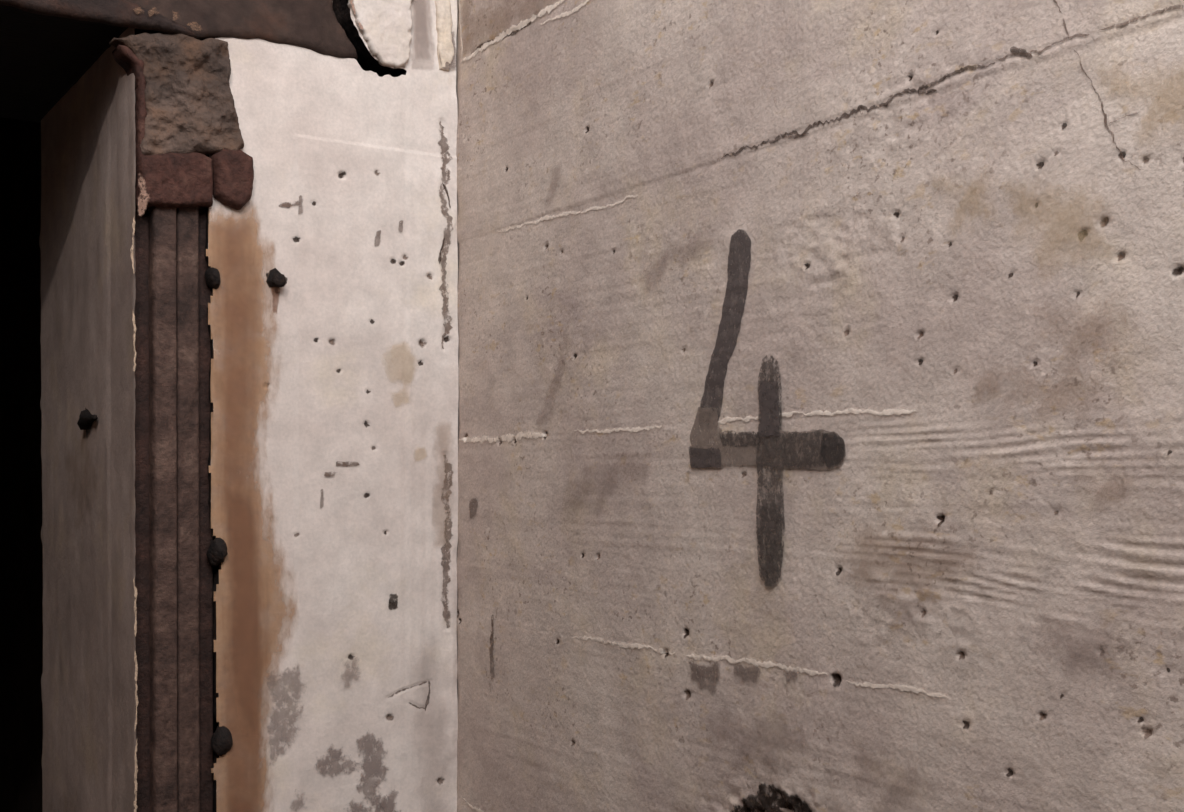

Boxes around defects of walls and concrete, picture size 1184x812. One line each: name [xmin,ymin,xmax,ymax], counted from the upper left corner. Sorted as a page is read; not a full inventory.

spalling [348,0,413,69]
crack [721,0,1183,170]
corrosion [206,209,295,812]
hole [732,783,812,812]